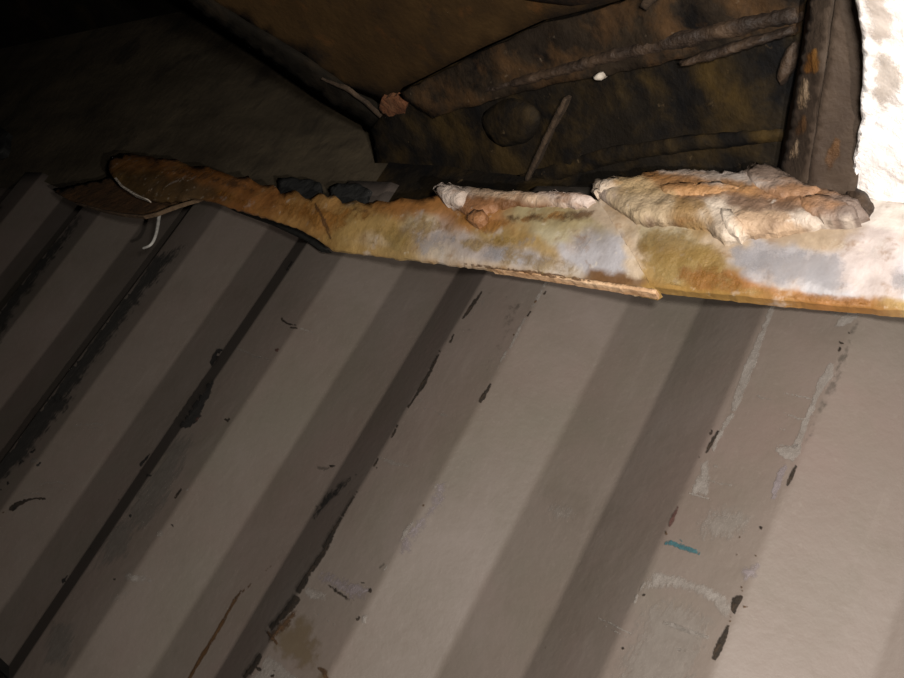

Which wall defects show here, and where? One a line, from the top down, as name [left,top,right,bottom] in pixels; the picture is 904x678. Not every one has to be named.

rust [777,41,818,158]
rust [433,162,870,246]
rust [472,264,590,281]